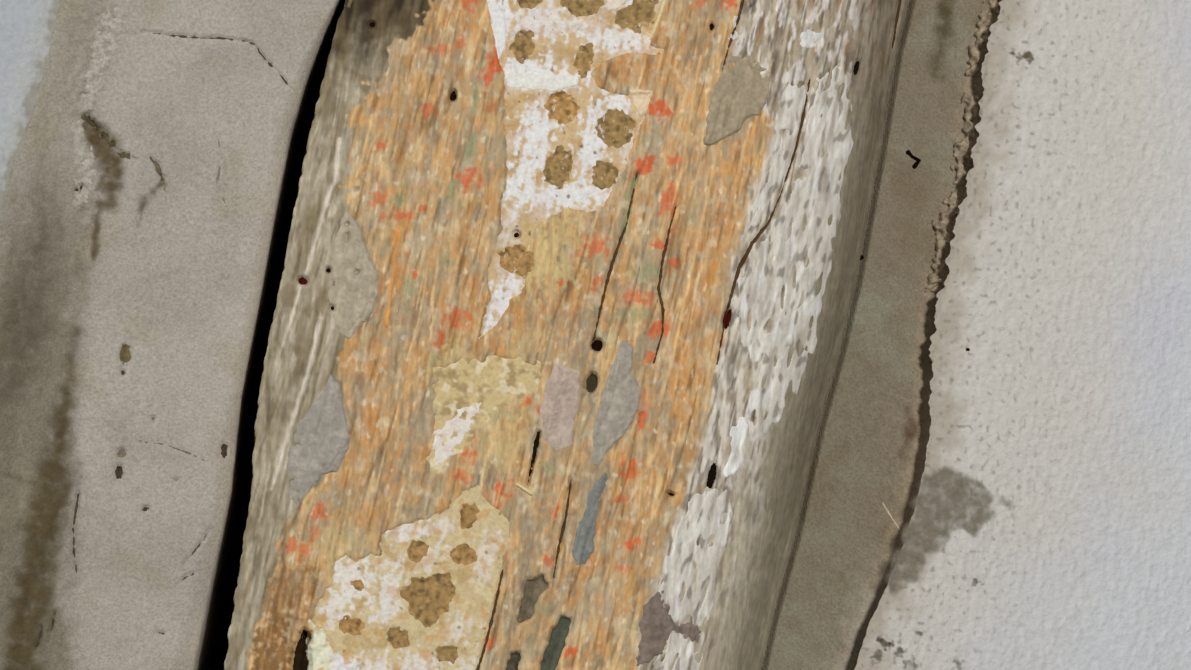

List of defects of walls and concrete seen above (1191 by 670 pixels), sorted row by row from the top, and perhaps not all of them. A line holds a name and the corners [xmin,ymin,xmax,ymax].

crack [153,33,288,85]
peeling [478,0,667,339]
water stain [6,409,68,670]
peeling [293,485,510,670]
water stain [889,468,991,592]